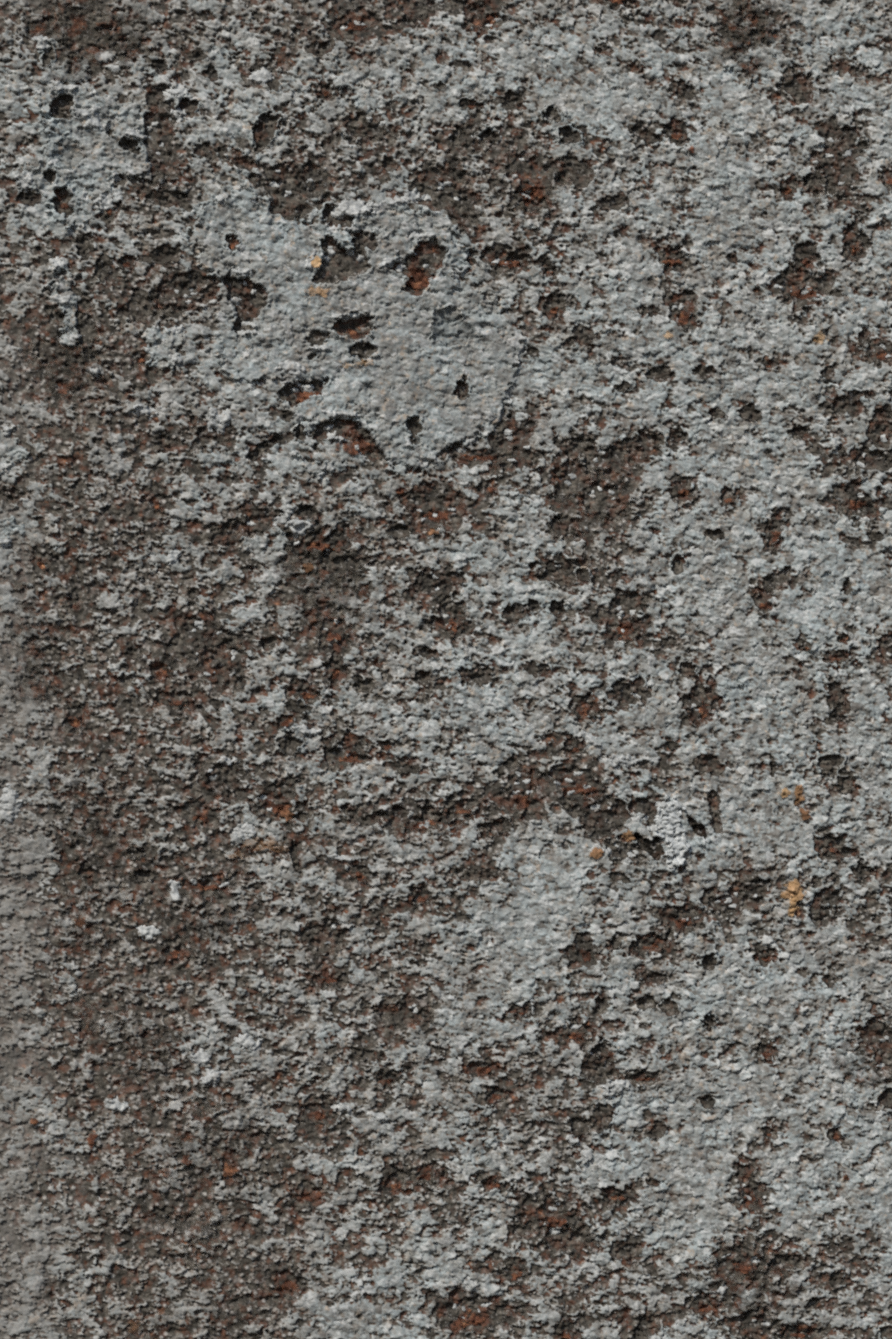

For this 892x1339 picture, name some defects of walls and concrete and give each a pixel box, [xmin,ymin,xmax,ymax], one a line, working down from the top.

corrosion [408,121,595,229]
corrosion [305,231,378,298]
corrosion [388,238,447,296]
corrosion [467,242,610,351]
corrosion [277,377,329,407]
corrosion [308,418,385,460]
corrosion [828,390,892,522]
corrosion [207,501,380,705]
corrosion [591,588,652,659]
corrosion [568,677,651,722]
corrosion [559,785,856,969]
corrosion [422,1257,532,1333]